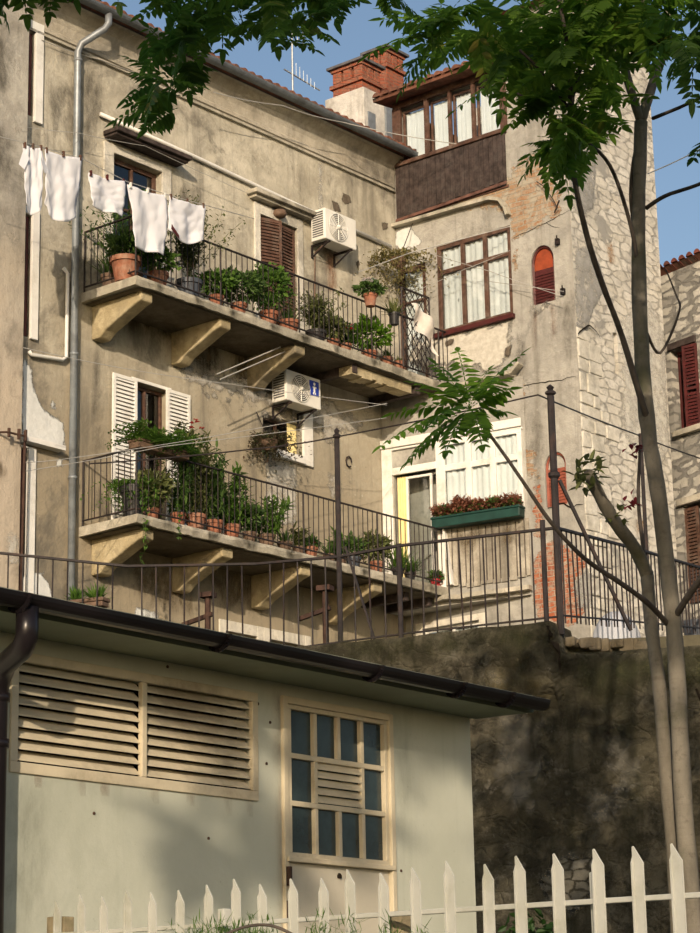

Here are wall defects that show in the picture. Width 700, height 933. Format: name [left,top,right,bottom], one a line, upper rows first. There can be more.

flaking render [456,154,564,271]
flaking render [526,450,586,627]